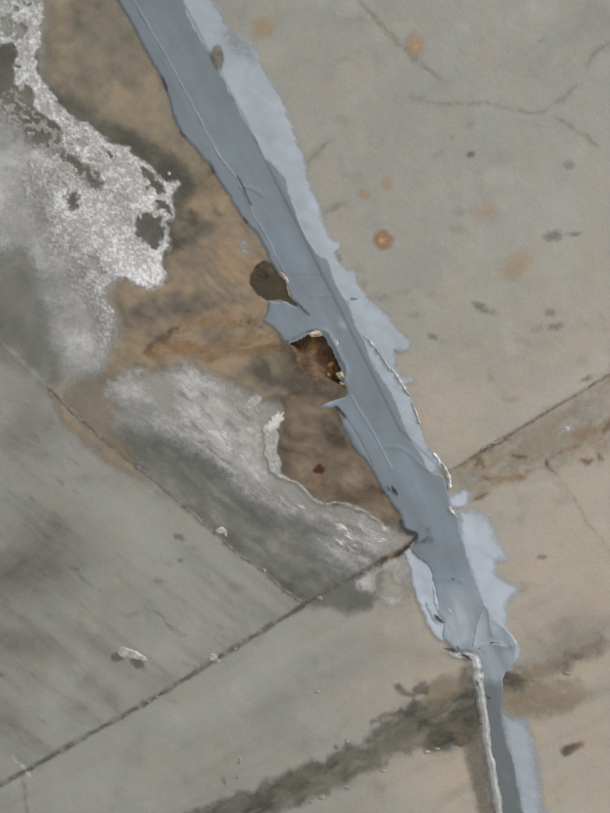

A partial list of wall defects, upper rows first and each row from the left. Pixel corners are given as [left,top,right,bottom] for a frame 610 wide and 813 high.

leakage [0,0,415,611]
rust [43,0,405,534]
peeling [250,261,297,306]
spalling [281,330,346,397]
crack [118,0,546,813]
leakage [194,669,492,813]